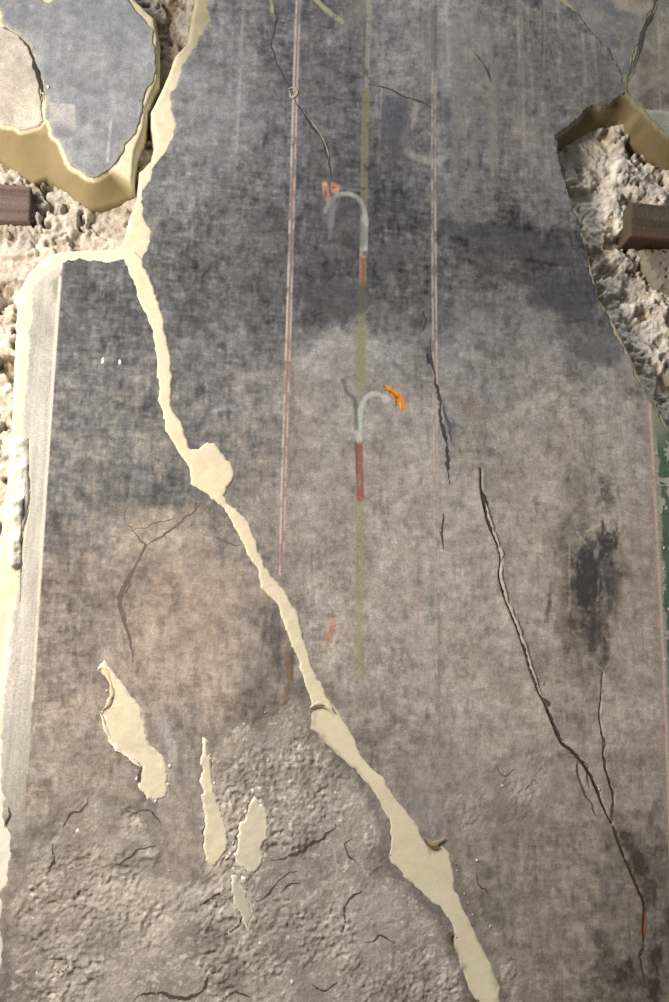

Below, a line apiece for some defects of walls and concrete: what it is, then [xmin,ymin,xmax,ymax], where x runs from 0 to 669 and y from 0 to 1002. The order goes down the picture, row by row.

crack [270,0,331,175]
peeling [654,440,669,527]
crack [117,251,500,1002]
damp [570,522,617,649]
crack [480,469,646,980]
spalling [0,660,464,1002]
spalling [460,859,522,1002]